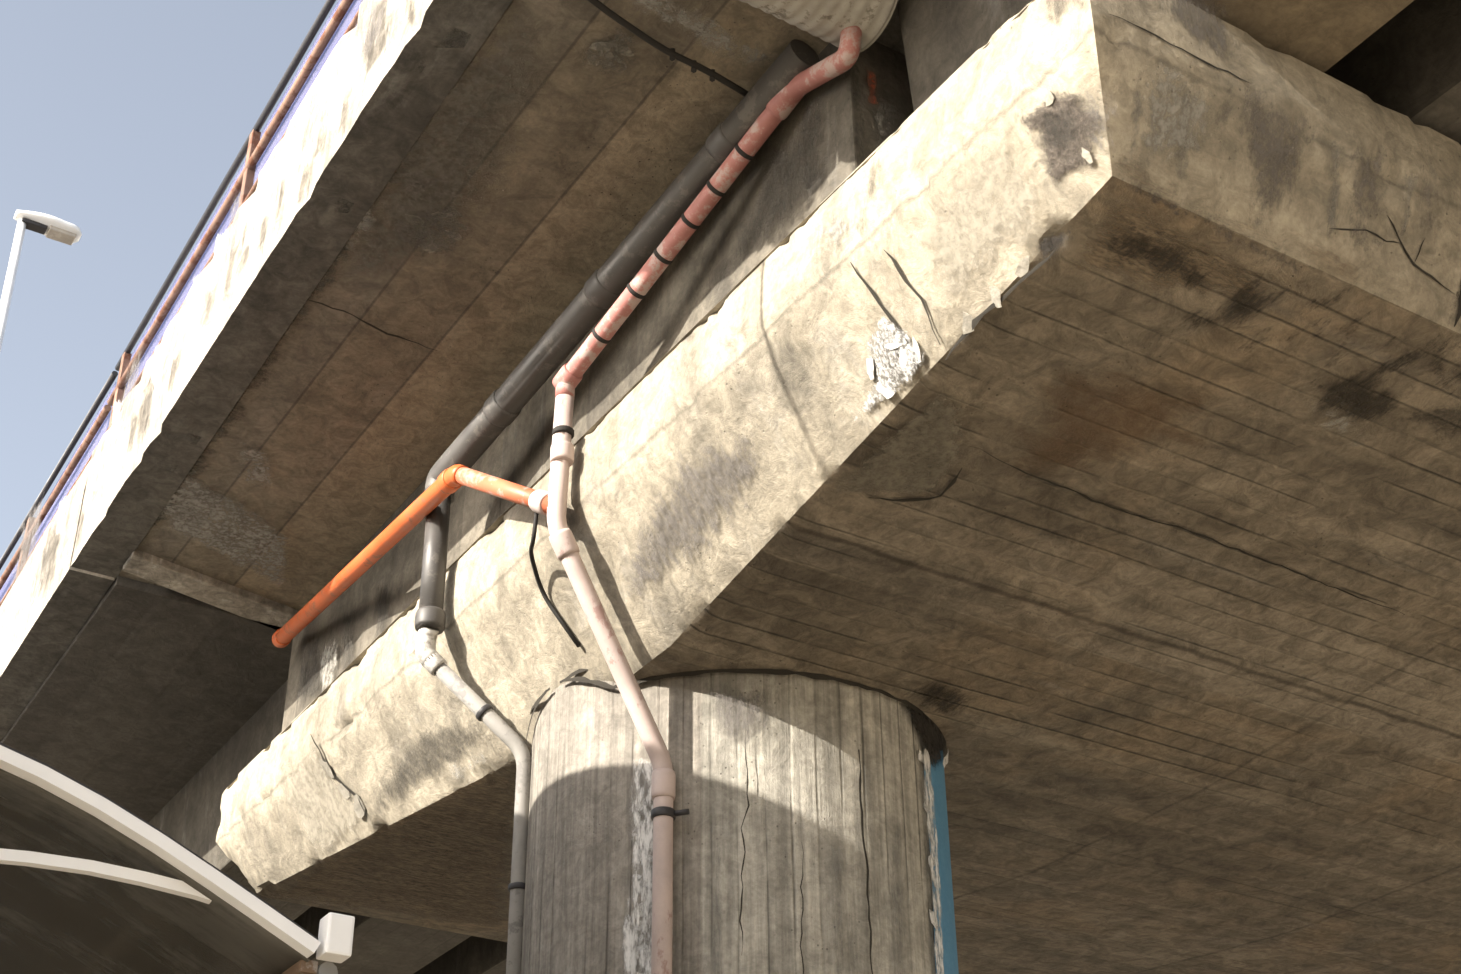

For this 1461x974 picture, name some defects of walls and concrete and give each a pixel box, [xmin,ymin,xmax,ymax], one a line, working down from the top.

crack [1110,14,1251,84]
crack [850,250,941,353]
spalling [946,234,1067,360]
crack [1330,215,1461,327]
peeling [867,337,922,399]
leakage [1312,345,1461,429]
leakage [632,438,756,595]
leakage [380,726,484,807]
peeling [623,761,653,974]
crack [739,730,750,956]
crack [858,749,873,974]
spalling [907,685,964,974]